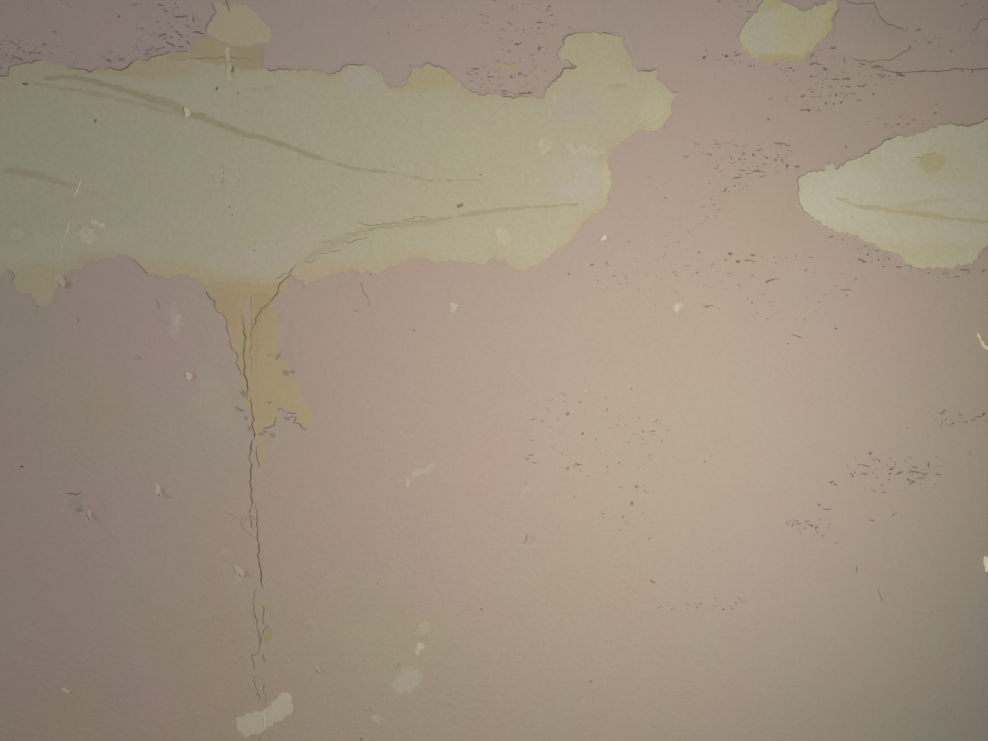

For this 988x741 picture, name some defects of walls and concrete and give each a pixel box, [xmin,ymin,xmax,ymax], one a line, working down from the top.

peeling [0,29,681,311]
peeling [725,0,865,87]
peeling [743,112,988,277]
crack [226,265,296,737]